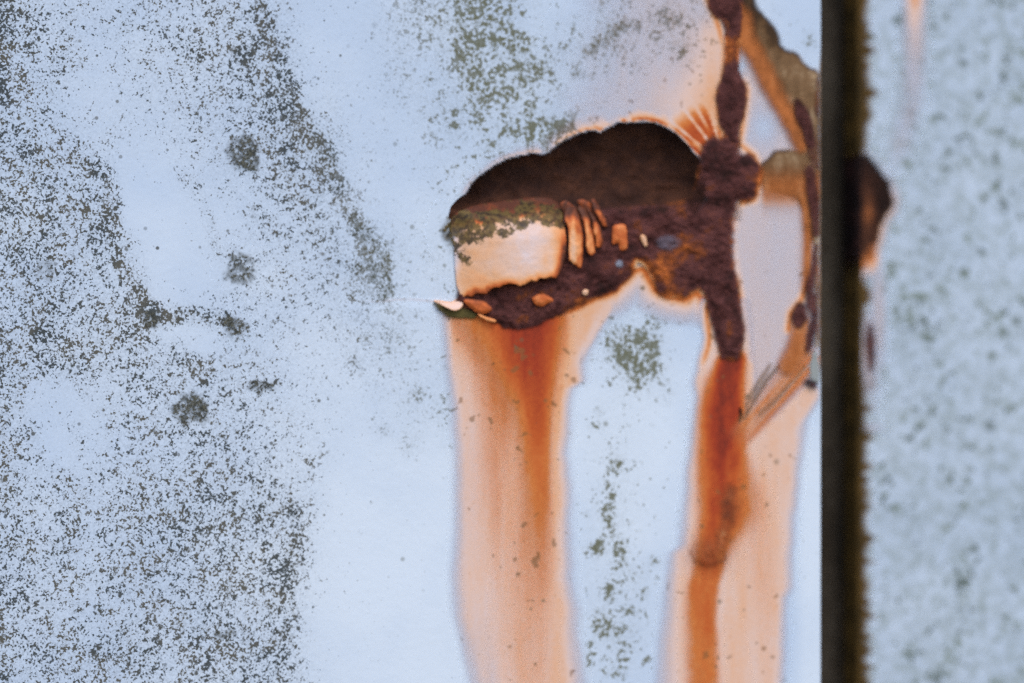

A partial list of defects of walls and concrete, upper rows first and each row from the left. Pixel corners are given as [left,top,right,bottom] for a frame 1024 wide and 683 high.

leakage [225,134,259,171]
spalling [448,121,705,323]
leakage [227,252,255,284]
leakage [223,317,248,339]
corrosion [441,0,821,683]
leakage [172,391,208,429]